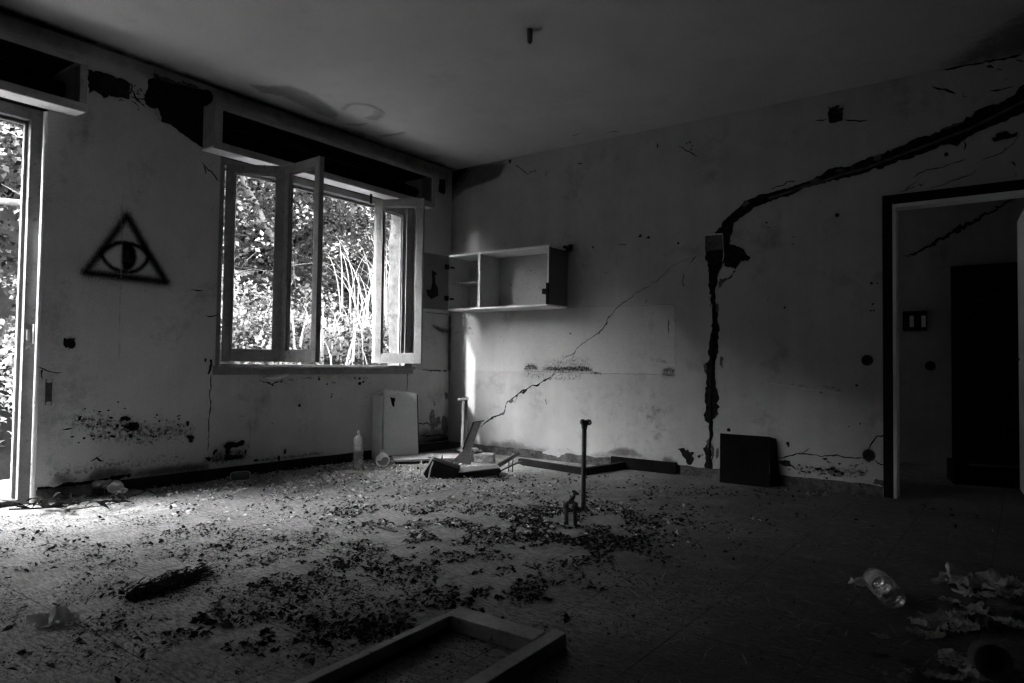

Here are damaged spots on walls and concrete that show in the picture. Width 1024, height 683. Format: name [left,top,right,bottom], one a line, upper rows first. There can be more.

spalling [88,69,130,99]
spalling [144,73,213,148]
crack [901,136,1018,257]
crack [481,256,696,427]
crack [778,435,883,465]